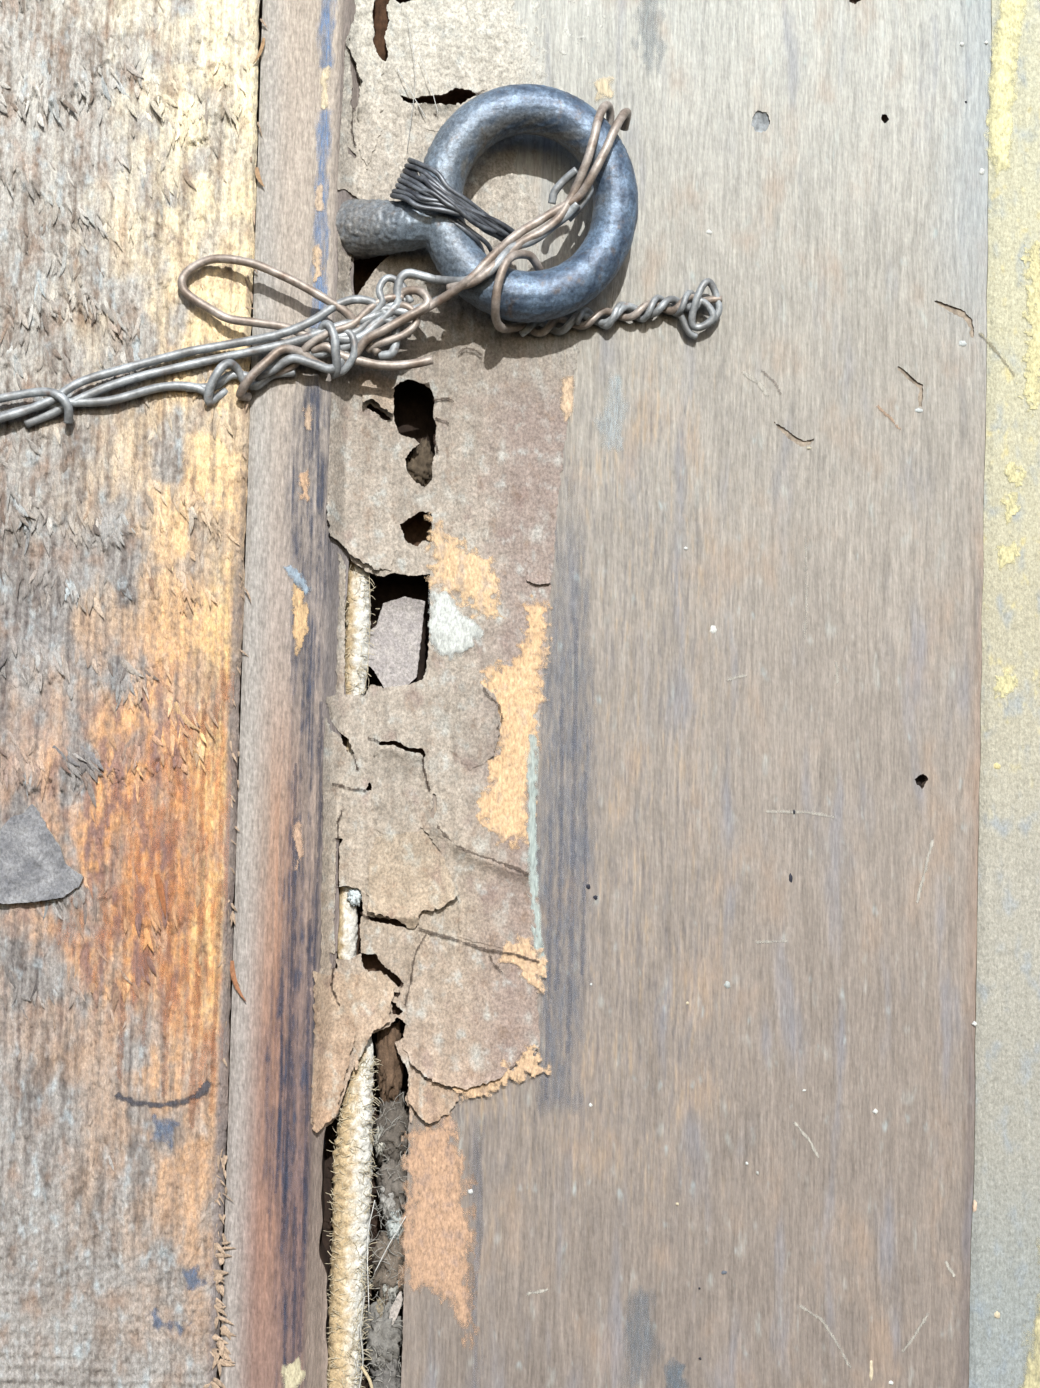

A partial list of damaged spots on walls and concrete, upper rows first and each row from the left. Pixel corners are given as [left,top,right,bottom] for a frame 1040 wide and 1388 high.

peeling [315,0,613,211]
peeling [463,135,591,269]
peeling [299,470,310,502]
peeling [293,822,303,867]
peeling [311,234,580,1344]